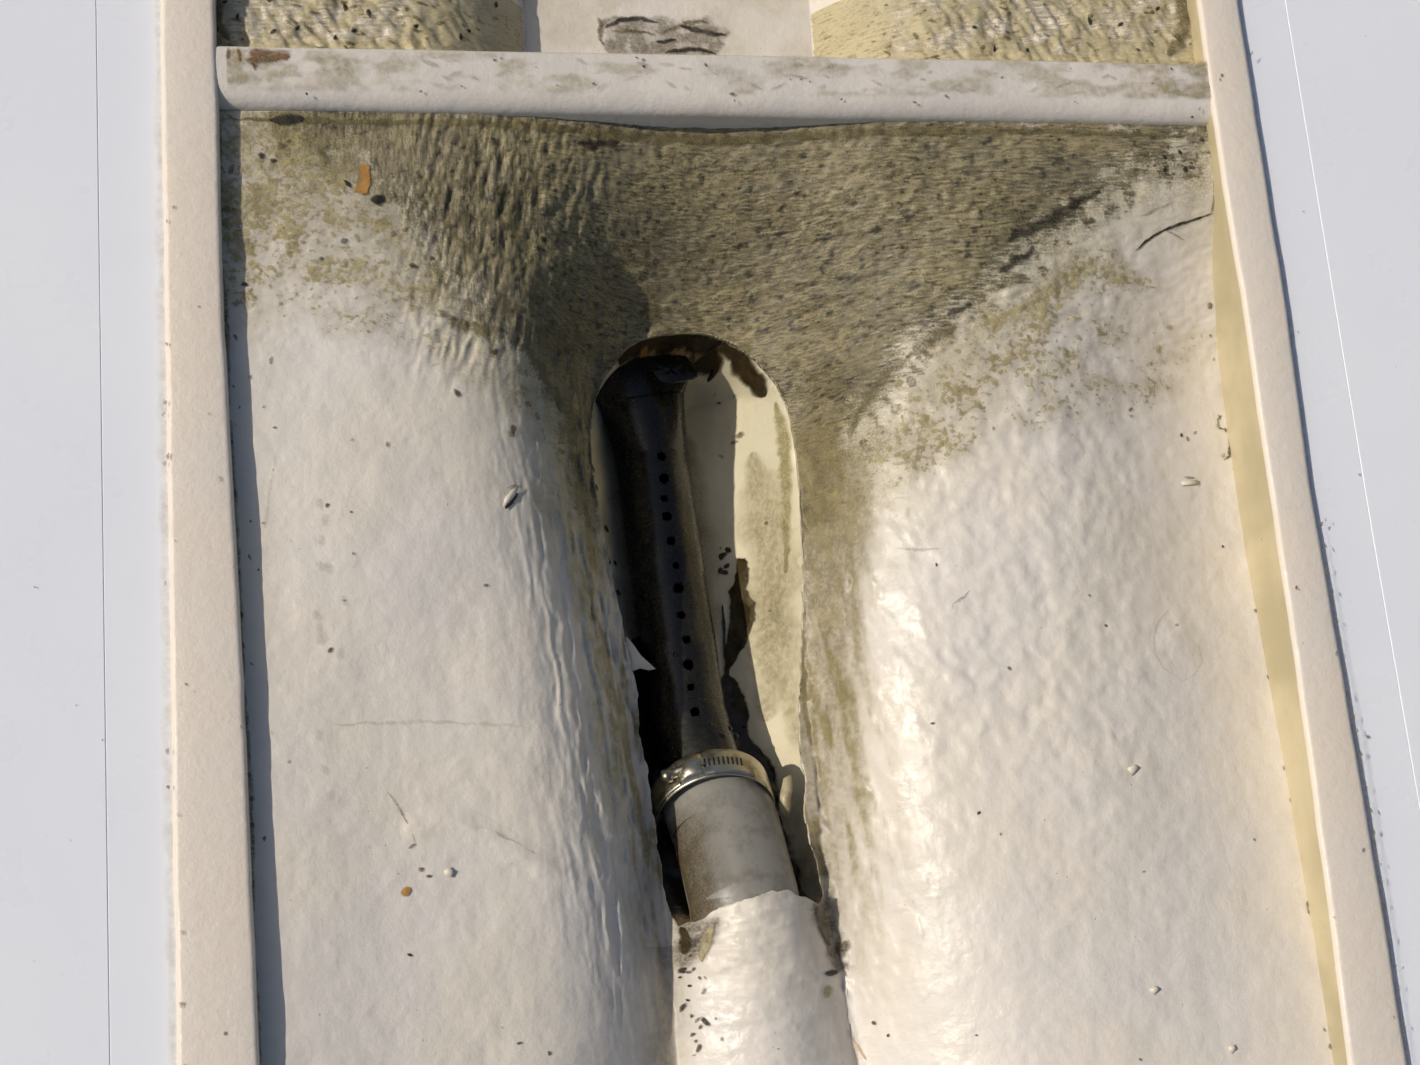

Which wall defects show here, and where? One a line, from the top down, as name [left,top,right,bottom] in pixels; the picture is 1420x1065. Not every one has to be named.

rust [344,163,384,204]
damp [220,109,1211,755]
peeling [625,636,655,671]
peeling [718,547,793,819]
damp [245,695,266,907]